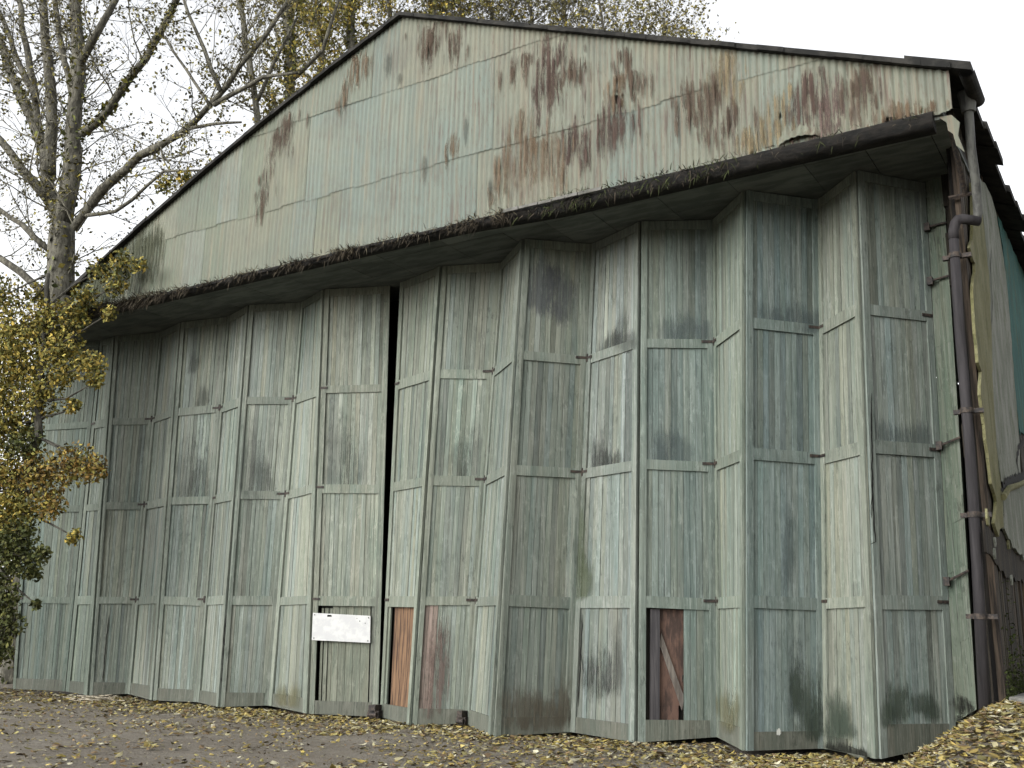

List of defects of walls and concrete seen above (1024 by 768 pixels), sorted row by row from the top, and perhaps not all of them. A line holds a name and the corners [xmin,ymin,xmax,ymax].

rust [405,21,468,71]
rust [335,52,373,116]
rust [487,33,653,206]
rust [670,51,949,155]
rust [254,111,308,224]
flaking render [982,508,1024,585]
water stain [789,662,803,709]
water stain [808,698,868,756]
water stain [908,692,938,720]